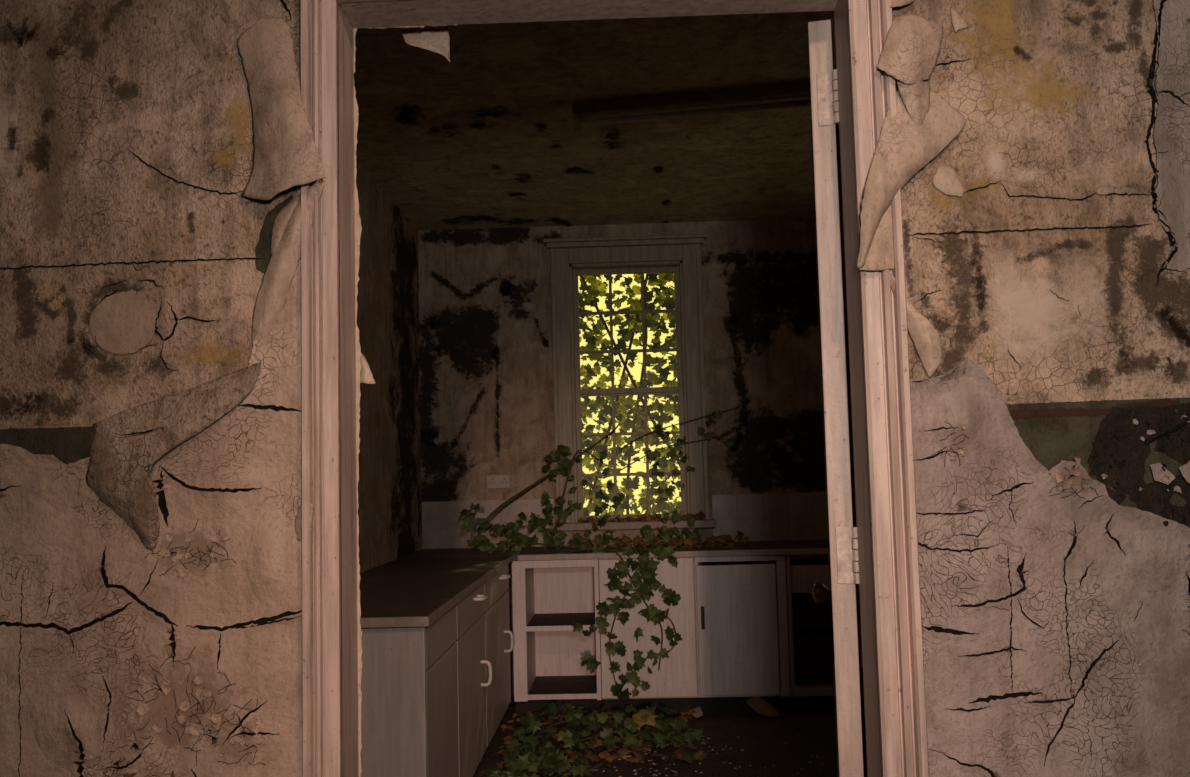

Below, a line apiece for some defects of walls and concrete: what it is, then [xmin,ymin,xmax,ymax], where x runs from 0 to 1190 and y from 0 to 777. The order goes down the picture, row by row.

leakage [46,0,132,61]
crack [906,0,1190,286]
leakage [0,264,143,426]
crack [0,257,263,371]
peeling [0,258,303,777]
crack [0,546,303,777]
crack [153,466,263,530]
mould [389,202,572,559]
mould [702,249,826,494]
crack [916,482,1143,766]
leakage [903,217,1190,387]
peeling [910,358,1190,777]